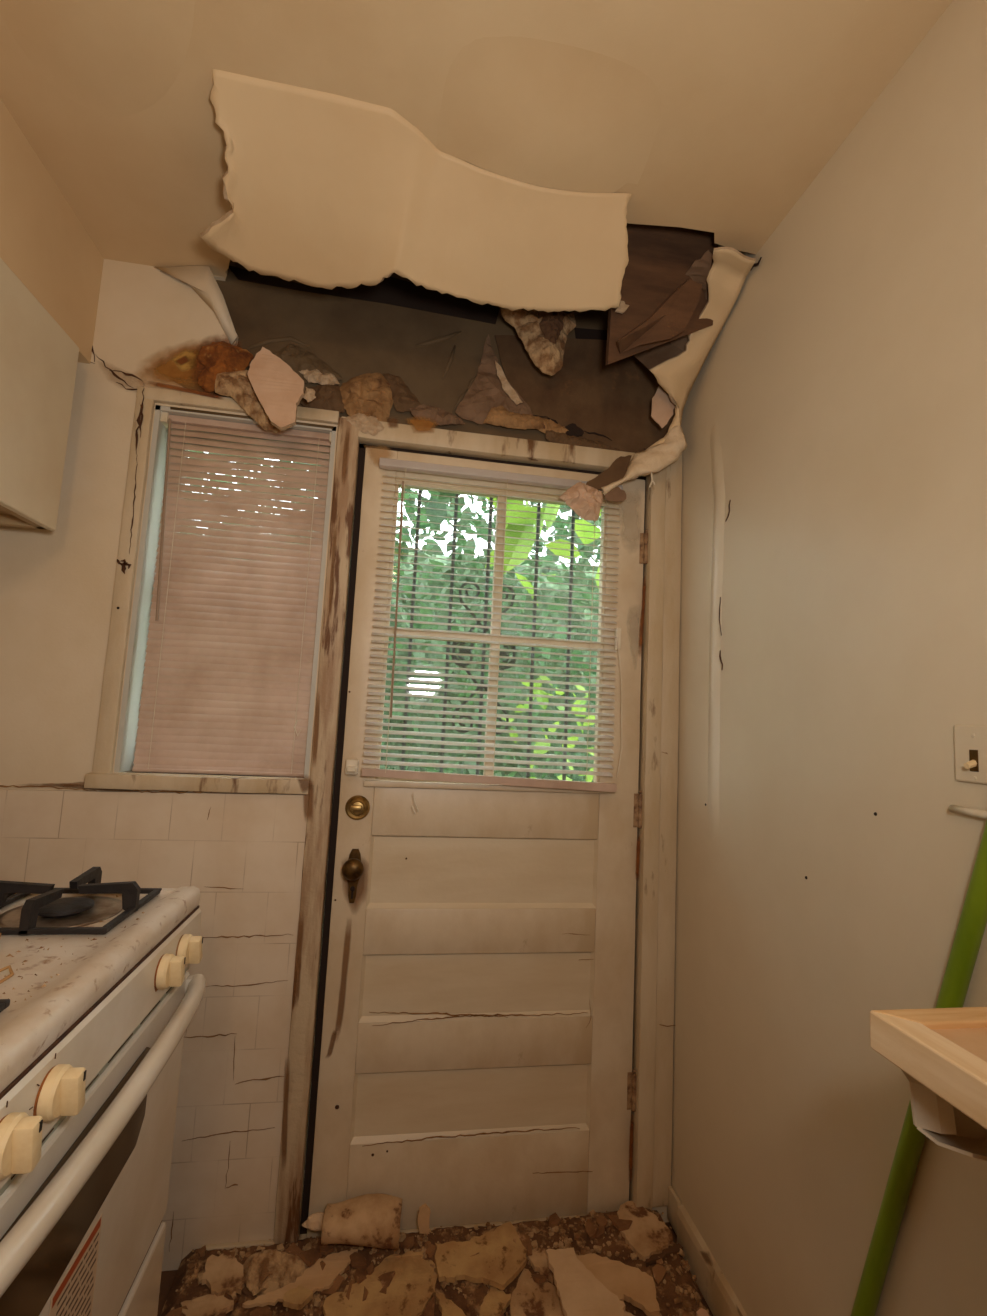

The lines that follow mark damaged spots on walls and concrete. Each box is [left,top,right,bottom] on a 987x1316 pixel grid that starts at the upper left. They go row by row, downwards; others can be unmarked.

spalling [154,266,238,344]
crack [203,932,291,940]
crack [206,979,288,987]
crack [185,1030,284,1084]
crack [183,1127,275,1188]